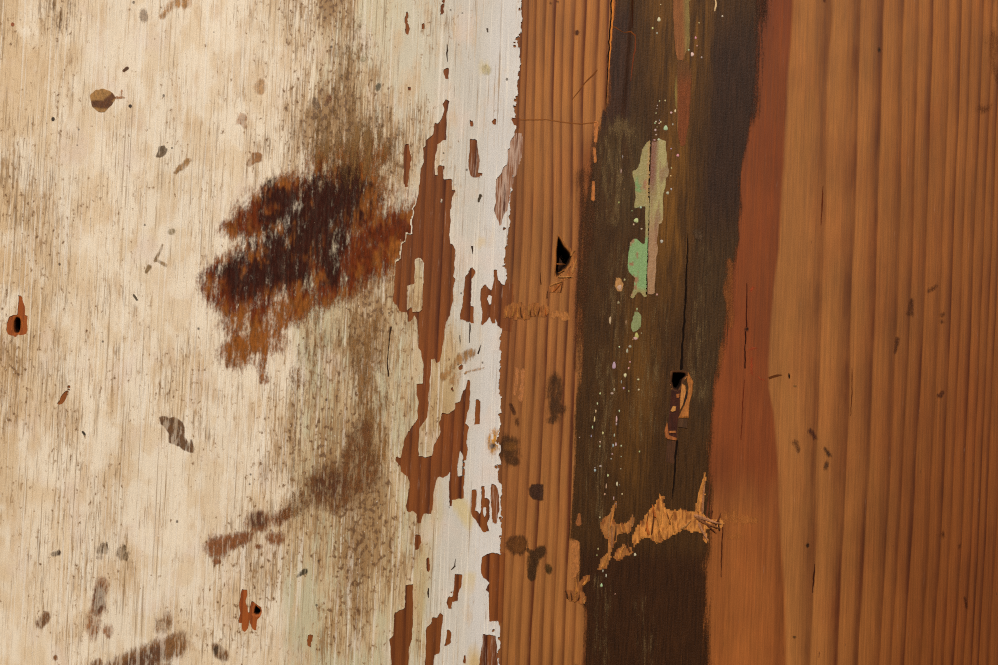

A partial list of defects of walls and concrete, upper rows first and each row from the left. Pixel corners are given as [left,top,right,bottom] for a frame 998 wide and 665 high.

peeling [393,99,577,550]
water stain [547,0,767,665]
spalling [564,472,725,605]
peeling [389,584,413,665]
peeling [425,574,462,665]
peeling [479,634,500,665]
peeling [481,552,505,623]